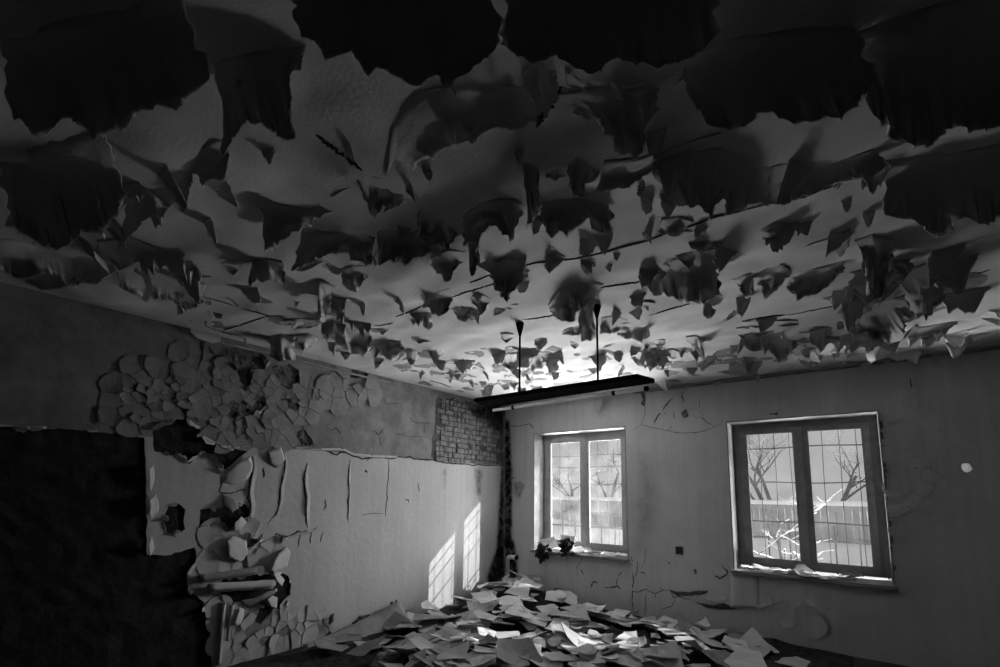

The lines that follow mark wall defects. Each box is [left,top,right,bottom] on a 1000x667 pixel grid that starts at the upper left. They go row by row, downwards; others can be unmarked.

peeling [0,0,306,316]
peeling [240,0,1000,392]
crack [219,399,521,547]
spalling [0,280,811,667]
crack [527,549,691,615]
crack [634,392,719,433]